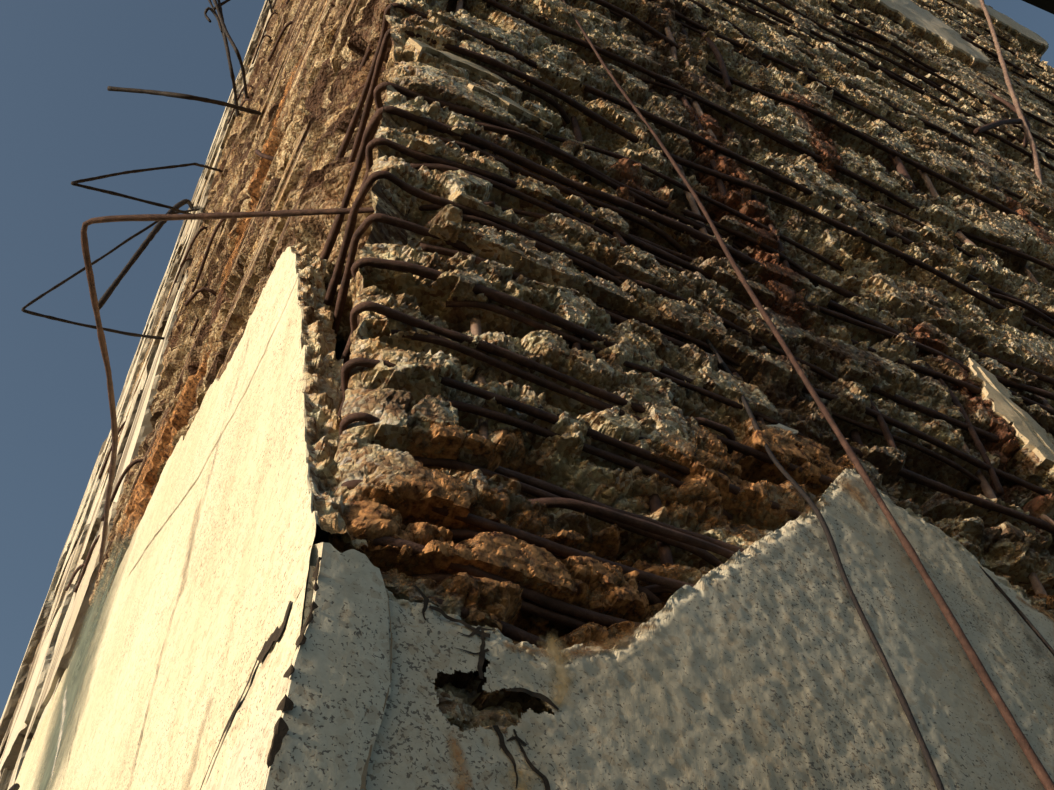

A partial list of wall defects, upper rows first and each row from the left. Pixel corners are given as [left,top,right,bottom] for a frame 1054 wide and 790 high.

corrosion [219,60,302,292]
spalling [188,0,1054,627]
corrosion [686,106,816,334]
corrosion [782,91,851,183]
corrosion [117,345,213,545]
peeling [0,214,337,790]
crack [360,591,392,790]
spalling [434,673,526,734]
crack [414,585,559,710]
corrosion [328,423,693,706]
crack [493,725,550,790]